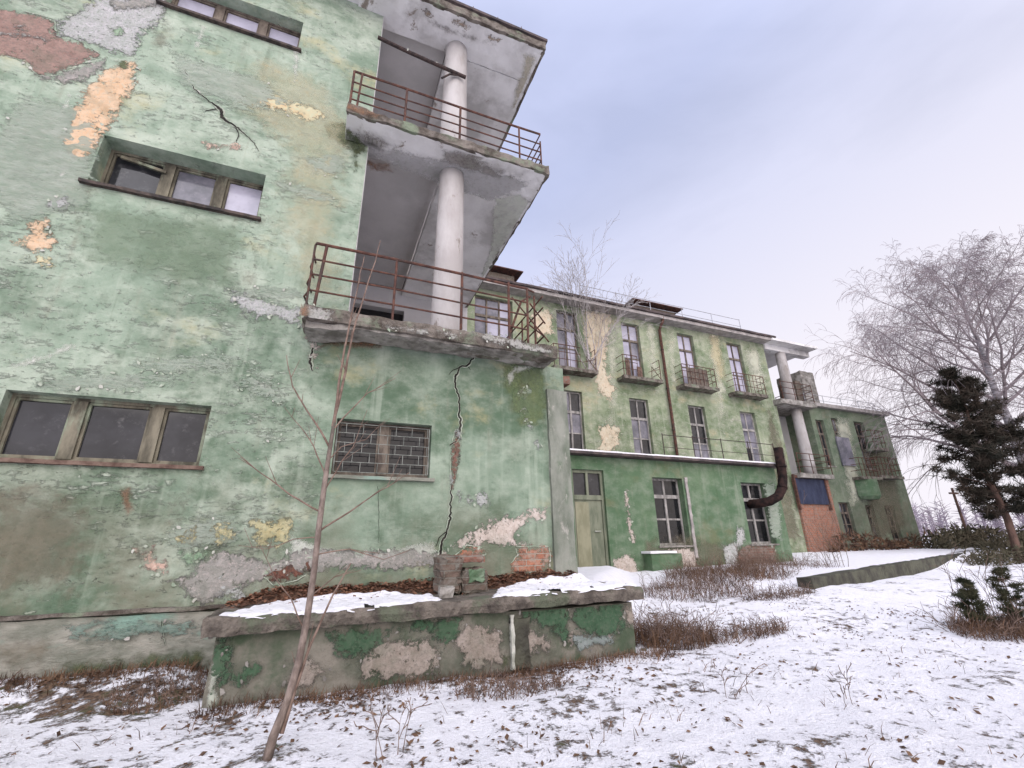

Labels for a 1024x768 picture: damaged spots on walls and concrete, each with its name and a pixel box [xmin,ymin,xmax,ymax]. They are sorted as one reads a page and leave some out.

peeling [0,0,170,268]
crack [184,69,259,151]
peeling [250,94,331,123]
peeling [583,311,619,403]
crack [449,358,475,446]
peeling [597,422,621,451]
spalling [131,506,553,606]
crack [436,485,454,555]
spalling [613,490,639,572]
peeling [723,480,783,564]
spalling [281,616,504,688]